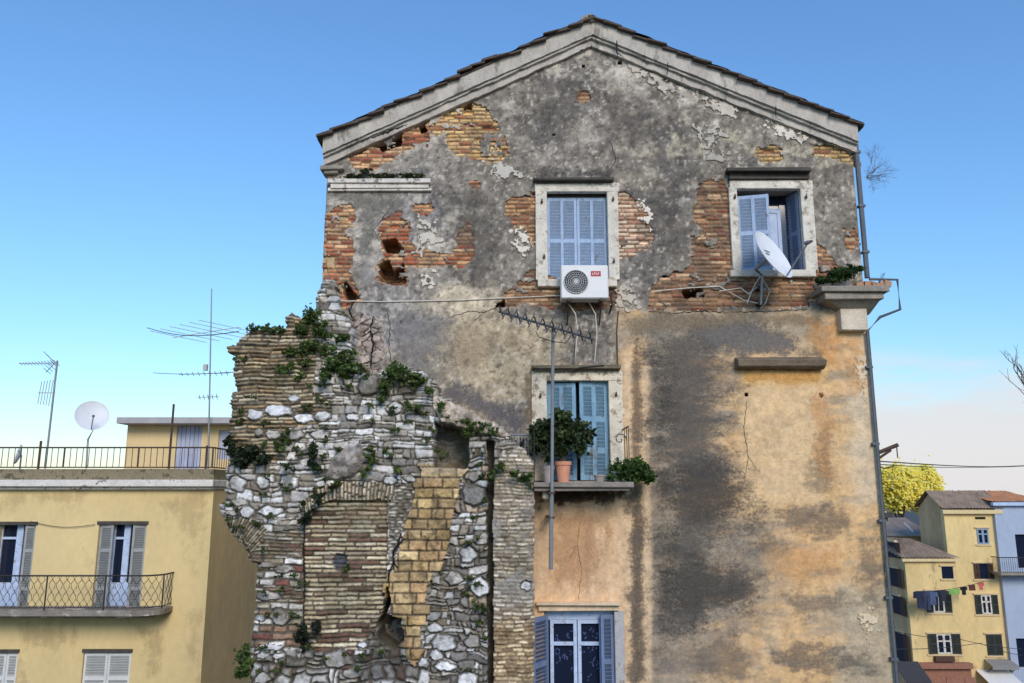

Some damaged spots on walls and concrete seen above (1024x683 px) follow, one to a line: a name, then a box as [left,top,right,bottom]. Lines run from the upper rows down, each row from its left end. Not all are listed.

flaking render [322,203,362,310]
flaking render [375,202,475,289]
flaking render [348,103,536,257]
flaking render [496,178,843,313]
flaking render [842,228,861,252]
crack [346,294,395,374]
damp [531,310,821,633]
damp [536,482,646,683]